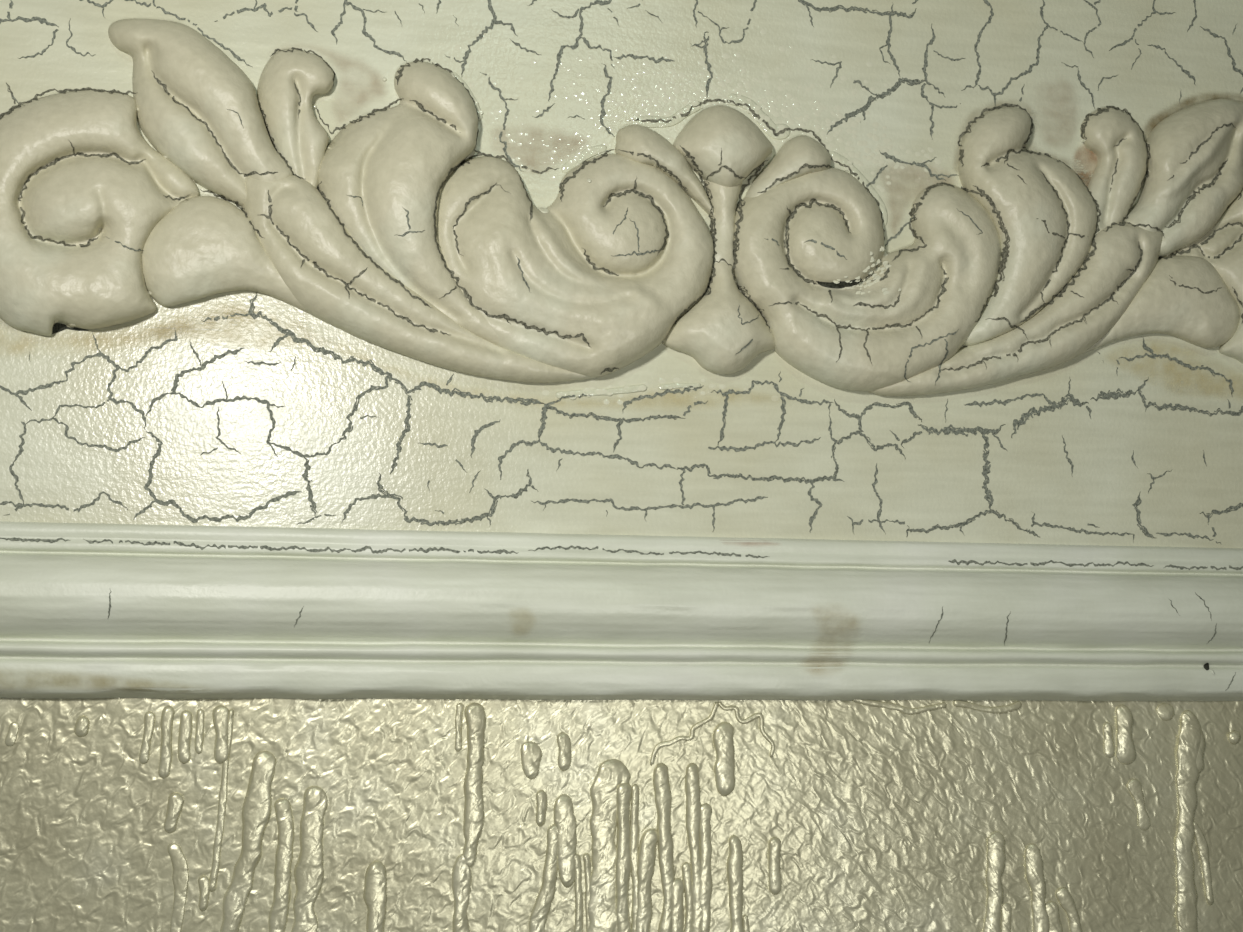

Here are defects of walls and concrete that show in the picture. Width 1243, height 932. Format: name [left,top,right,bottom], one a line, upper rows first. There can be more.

crack [0,0,1243,642]